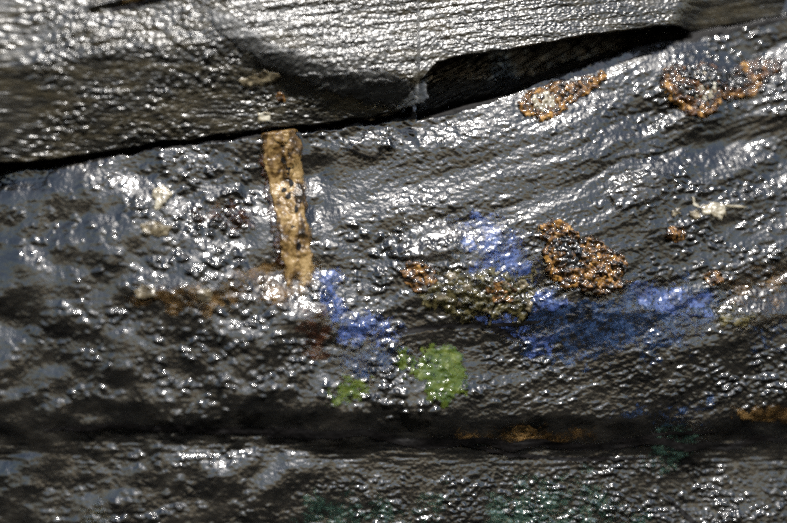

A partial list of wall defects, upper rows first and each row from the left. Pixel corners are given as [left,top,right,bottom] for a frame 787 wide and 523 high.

crack [296,15,787,133]
rust [517,70,608,122]
rust [660,58,786,120]
crack [52,133,263,167]
rust [125,128,330,360]
rust [400,260,438,294]
rust [485,280,518,304]
rust [538,218,630,296]
leakage [312,269,468,409]